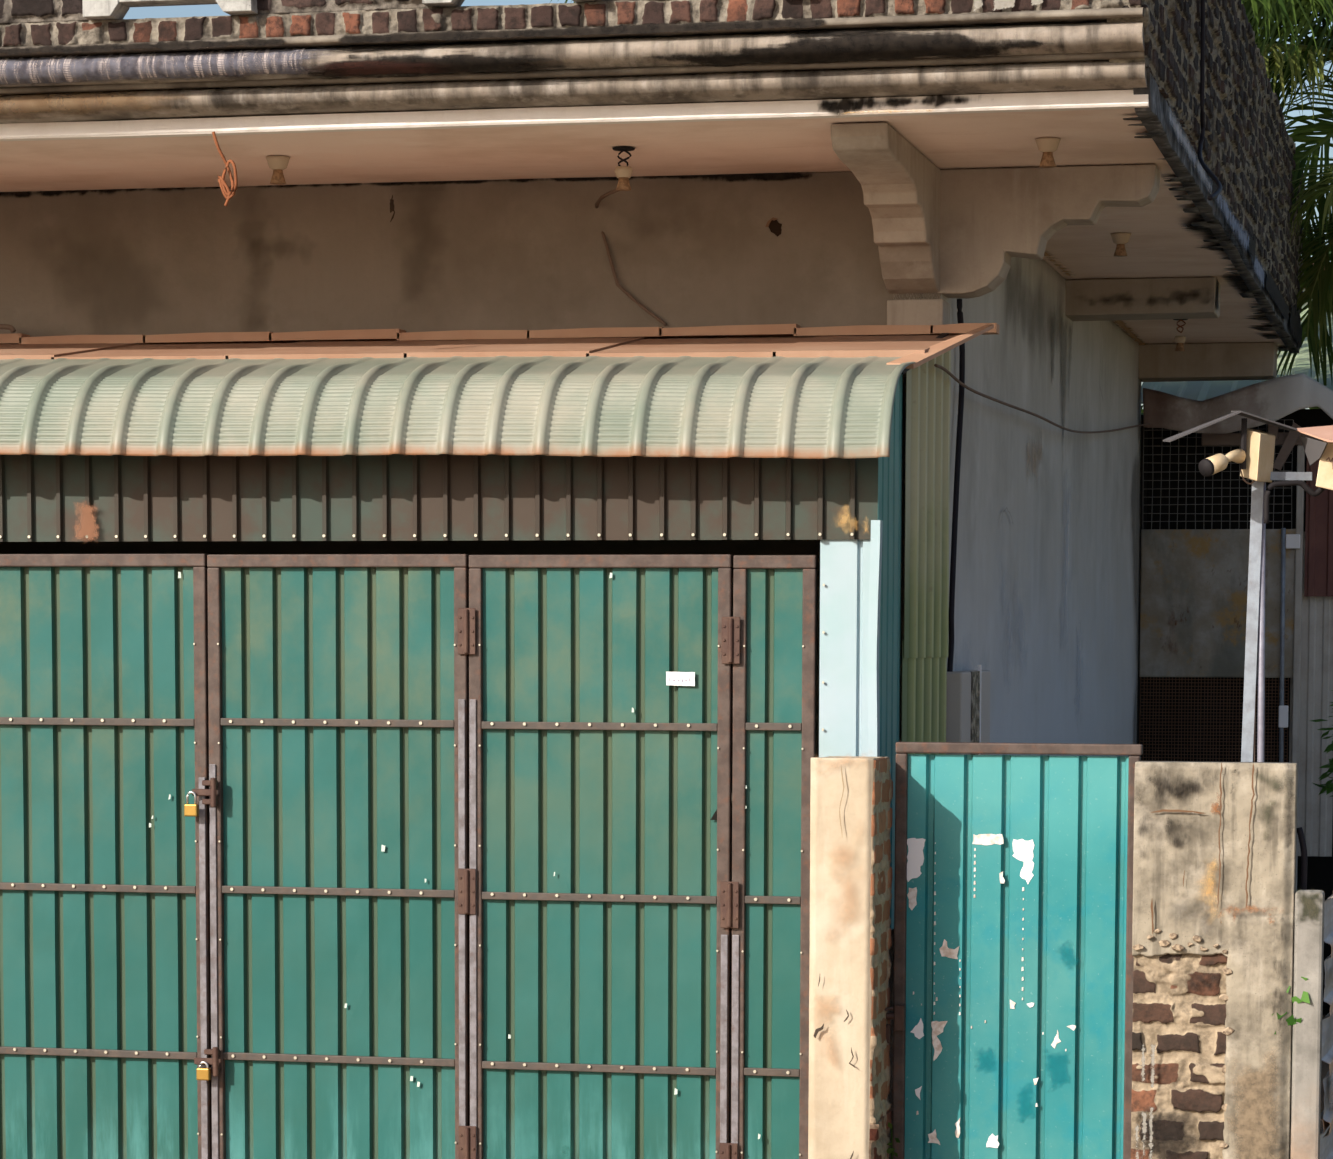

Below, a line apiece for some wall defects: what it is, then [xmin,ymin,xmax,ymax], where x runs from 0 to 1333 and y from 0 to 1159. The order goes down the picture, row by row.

leakage [0,18,1044,115]
rust [75,504,98,540]
leakage [1149,775,1198,798]
leakage [1166,821,1186,847]
flaking render [1131,929,1234,1159]
spalling [869,1111,892,1159]